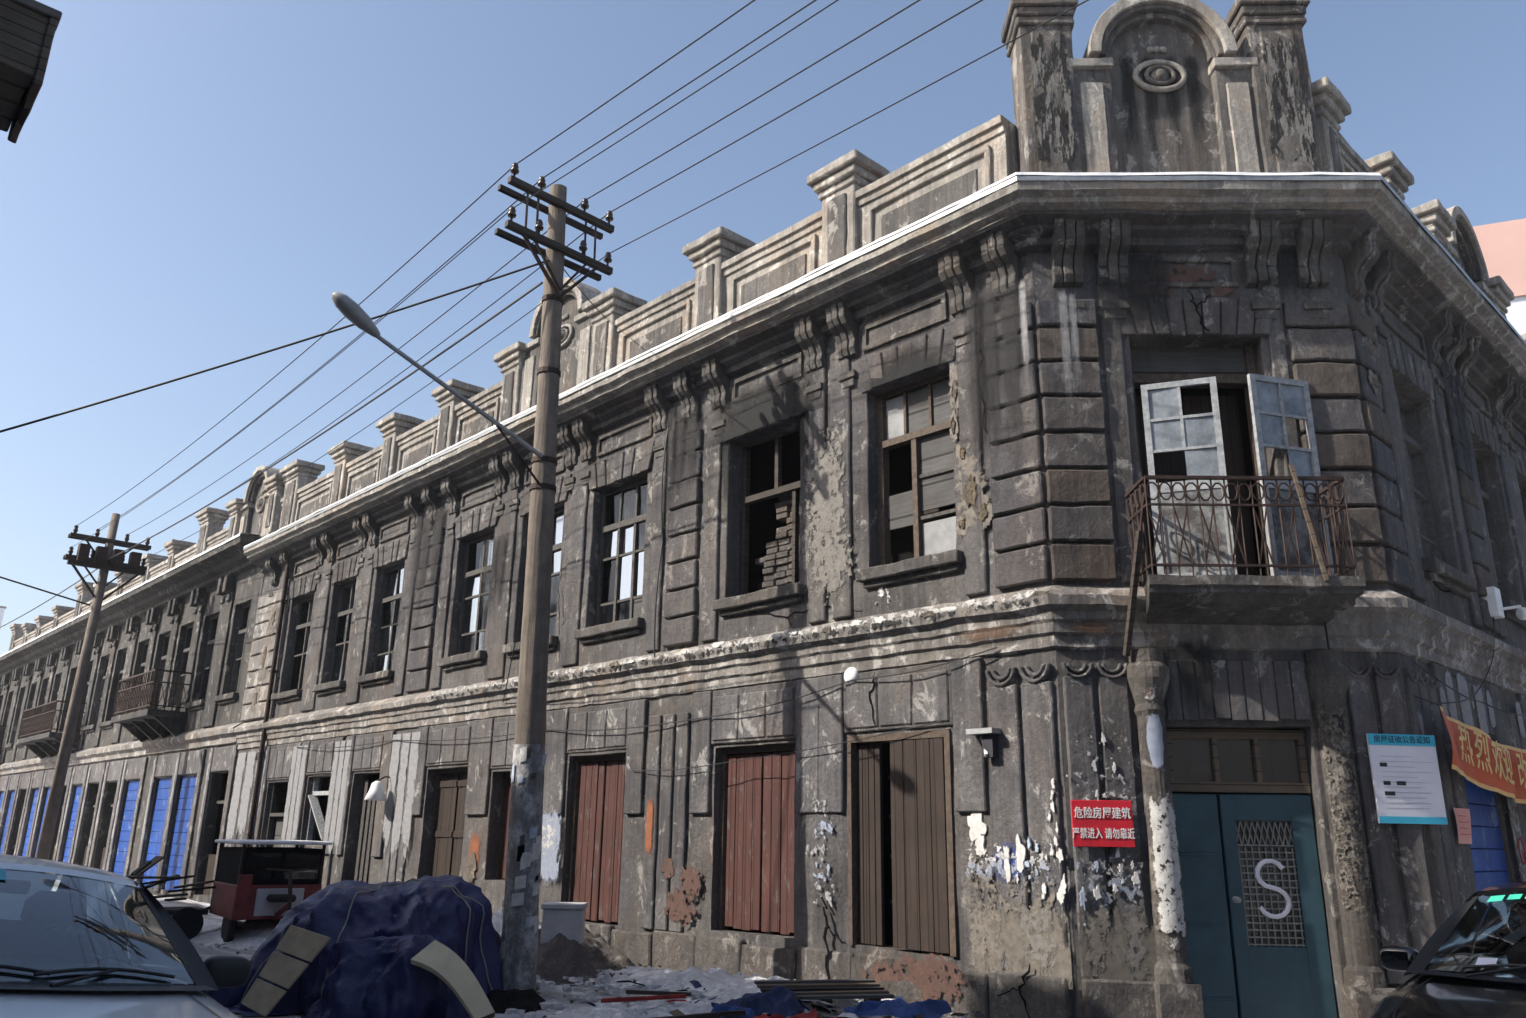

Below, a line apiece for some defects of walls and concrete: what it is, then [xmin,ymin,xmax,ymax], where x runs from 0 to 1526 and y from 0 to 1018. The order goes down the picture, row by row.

crack [1187,290,1211,331]
peeling [511,746,547,784]
peeling [511,827,543,927]
flaking render [862,685,1188,1004]
crack [821,897,838,979]